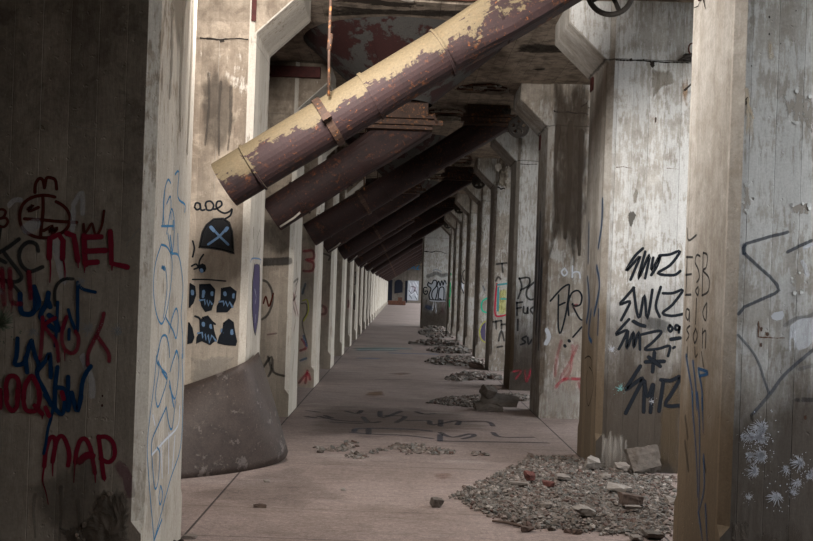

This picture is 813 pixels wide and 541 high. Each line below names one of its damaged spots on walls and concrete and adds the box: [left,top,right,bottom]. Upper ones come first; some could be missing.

crack [200,35,248,43]
damp [550,83,588,258]